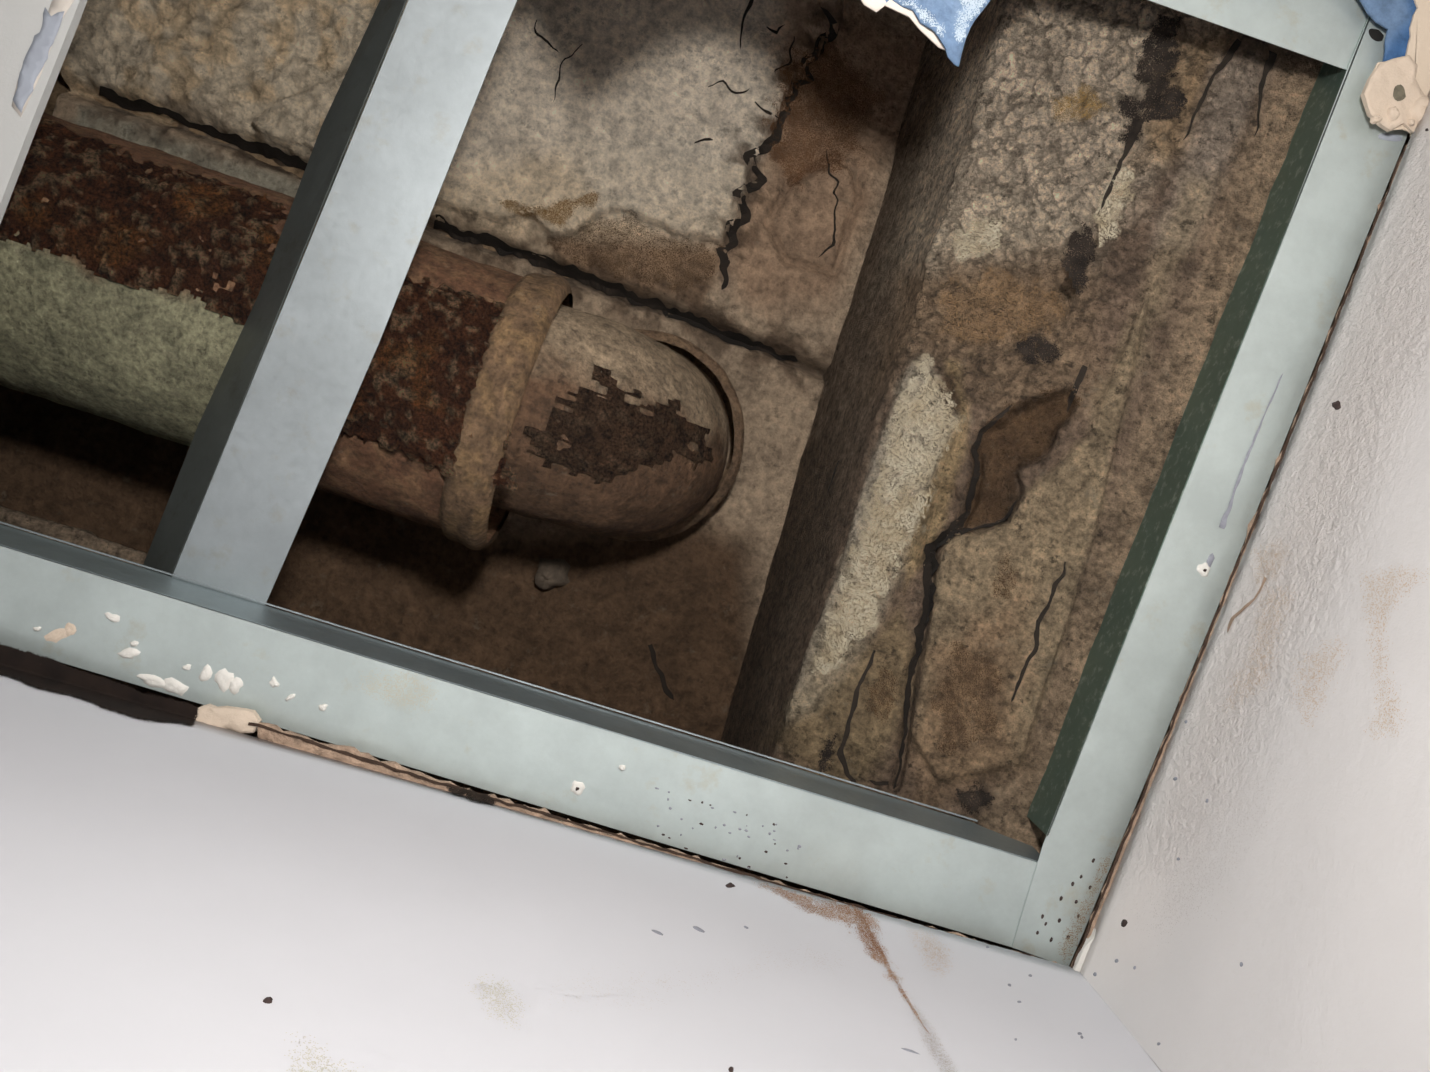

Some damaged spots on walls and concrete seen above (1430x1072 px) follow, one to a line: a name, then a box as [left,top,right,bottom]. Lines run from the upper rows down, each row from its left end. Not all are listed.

peeling [13,7,65,113]
crack [99,86,307,171]
crack [433,0,840,362]
crack [1101,118,1141,209]
crack [1183,39,1277,140]
peeling [104,612,120,623]
peeling [117,641,243,696]
peeling [269,676,295,701]
crack [837,405,1017,789]
crack [1011,561,1066,702]